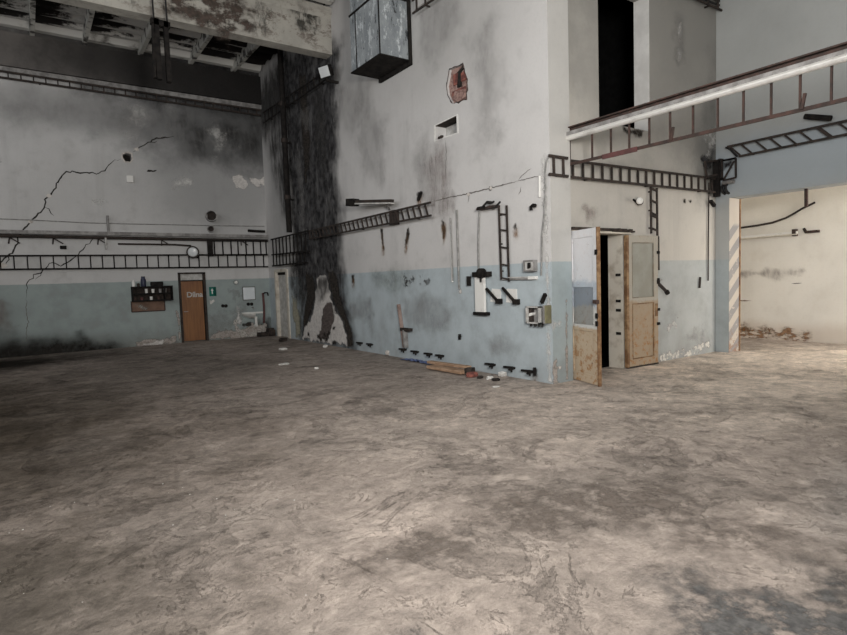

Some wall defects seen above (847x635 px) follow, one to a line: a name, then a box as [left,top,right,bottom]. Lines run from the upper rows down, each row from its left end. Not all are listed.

leakage [163,0,255,39]
leakage [291,9,317,30]
spalling [446,63,468,104]
crack [1,136,173,268]
crack [25,239,93,339]
leakage [292,274,315,337]
flaking render [302,275,347,345]